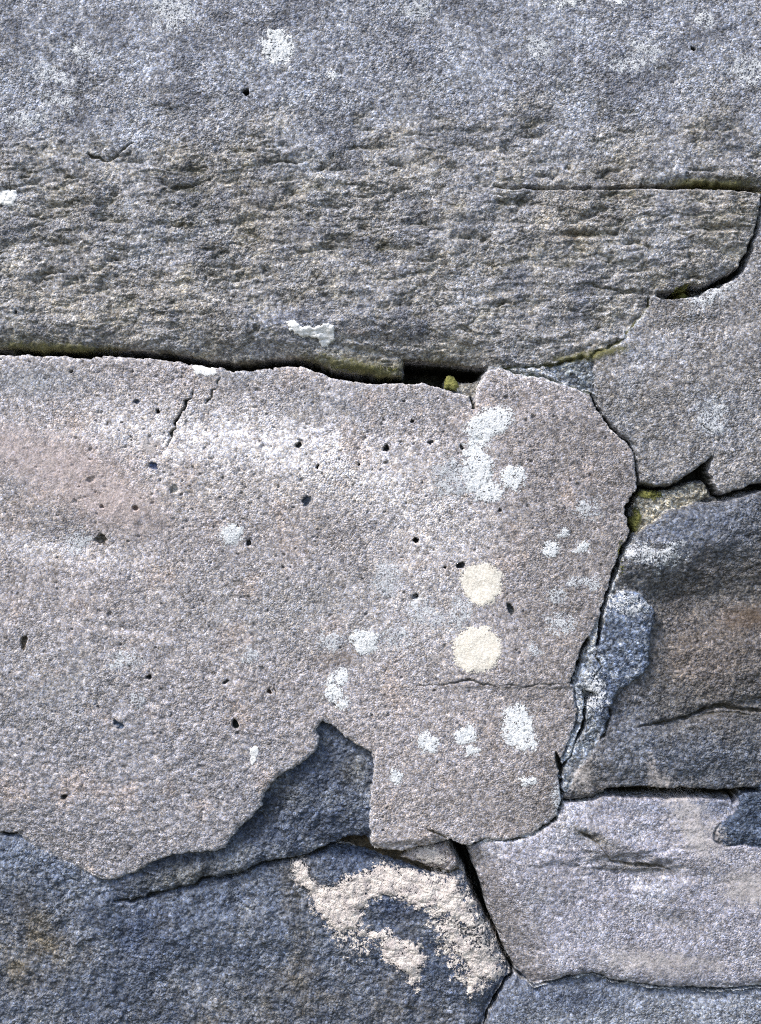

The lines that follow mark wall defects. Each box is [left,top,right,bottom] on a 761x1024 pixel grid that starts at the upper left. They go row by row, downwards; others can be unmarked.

crack [5,342,141,359]
crack [115,179,761,1024]